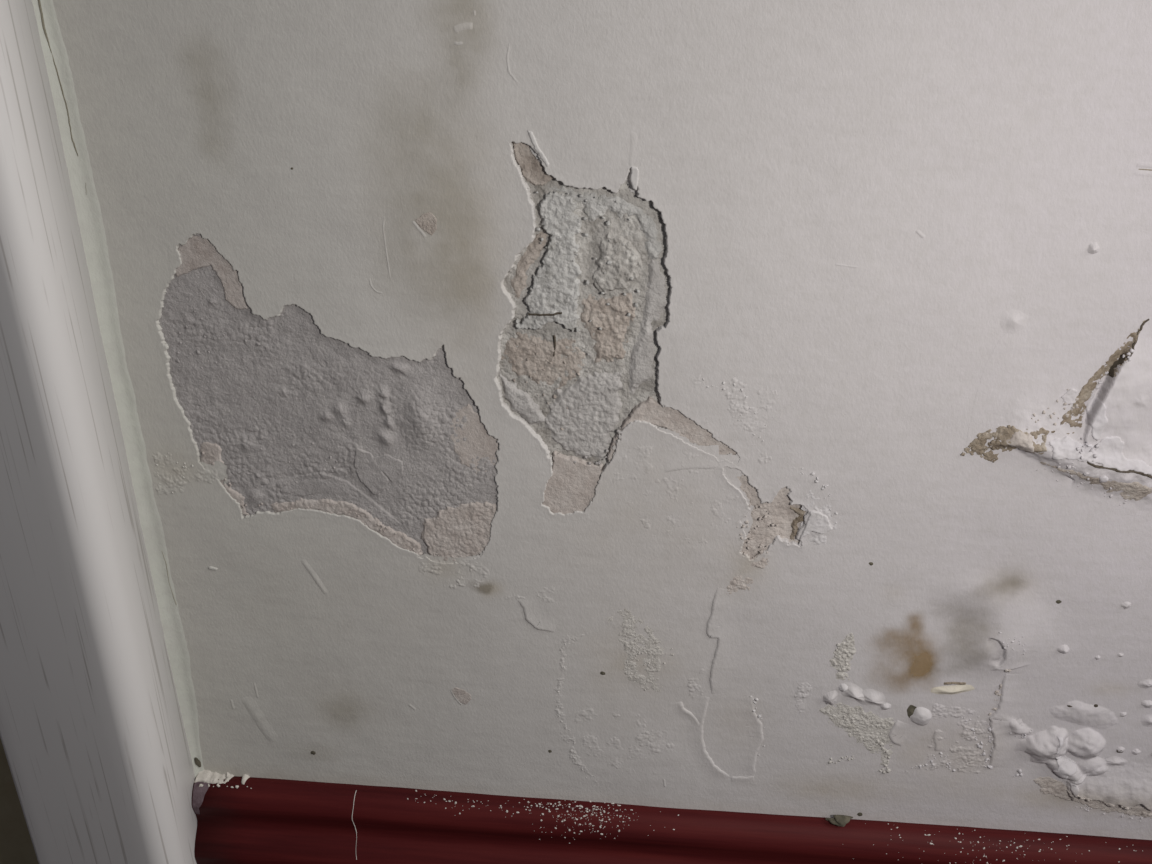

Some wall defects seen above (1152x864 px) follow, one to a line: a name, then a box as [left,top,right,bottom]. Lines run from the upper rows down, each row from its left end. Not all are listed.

peeling [147,130,833,572]
damp [829,633,856,680]
damp [906,623,934,678]
damp [819,702,895,774]
damp [906,703,990,774]